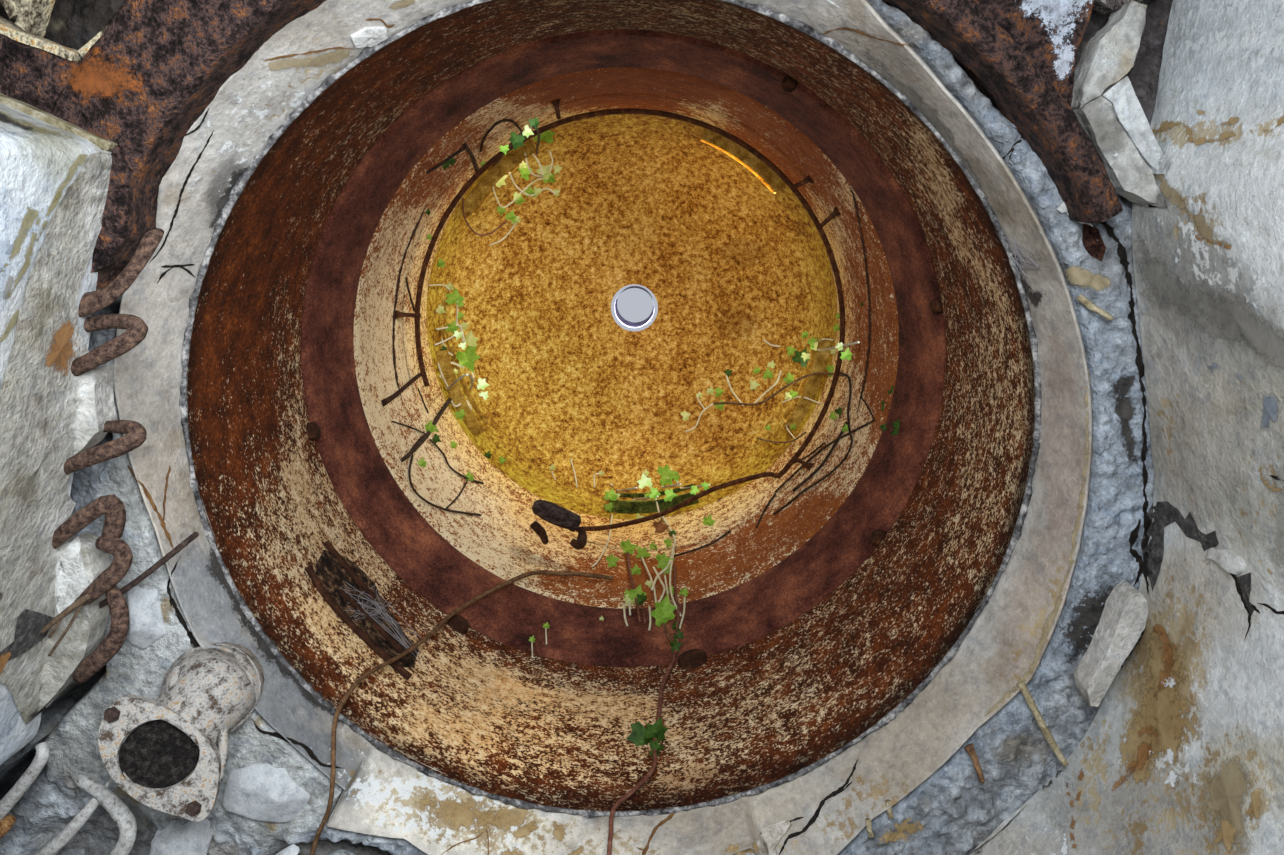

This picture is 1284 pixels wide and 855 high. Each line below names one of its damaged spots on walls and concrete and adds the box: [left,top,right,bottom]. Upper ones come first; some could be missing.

rust [390,0,415,9]
crack [1100,221,1151,593]
spalling [64,420,147,474]
crack [1230,573,1284,640]
crack [779,759,858,855]
leakage [1164,770,1177,787]
leakage [1202,756,1261,853]